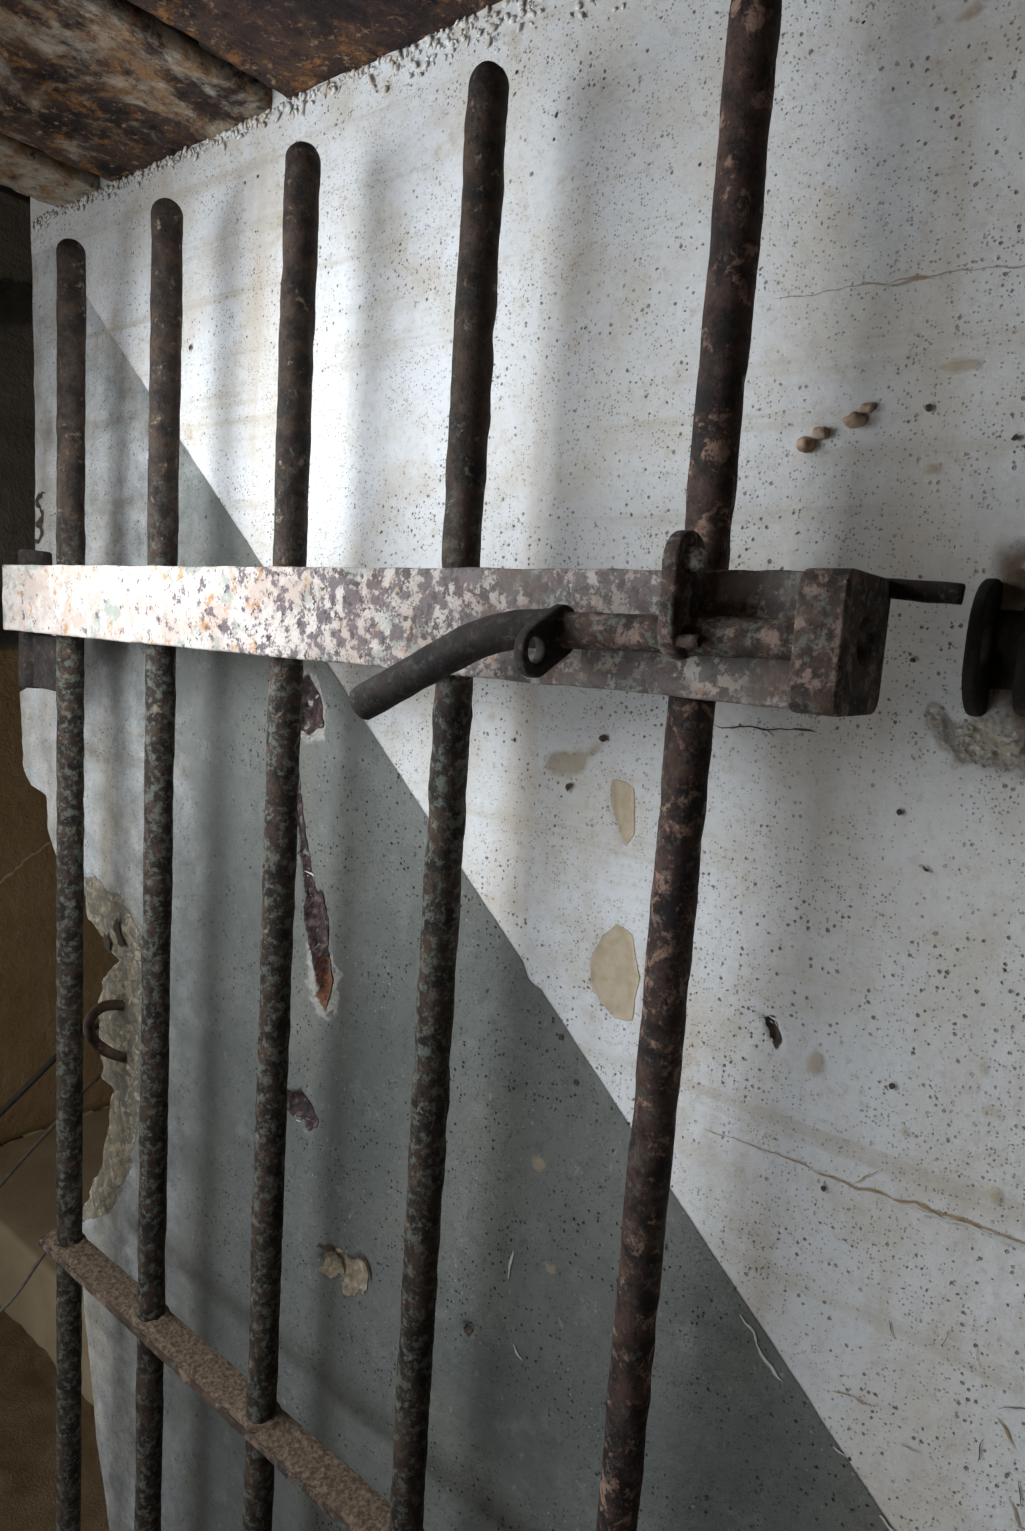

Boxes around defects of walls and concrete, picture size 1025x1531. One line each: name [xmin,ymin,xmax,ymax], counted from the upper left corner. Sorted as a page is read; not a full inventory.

peeling [32,0,545,233]
crack [774,265,1025,299]
spalling [925,703,1025,778]
spalling [83,876,142,1222]
crack [703,1128,1025,1250]
spalling [317,1243,370,1297]
crack [831,1391,870,1405]
crack [977,1407,1025,1531]